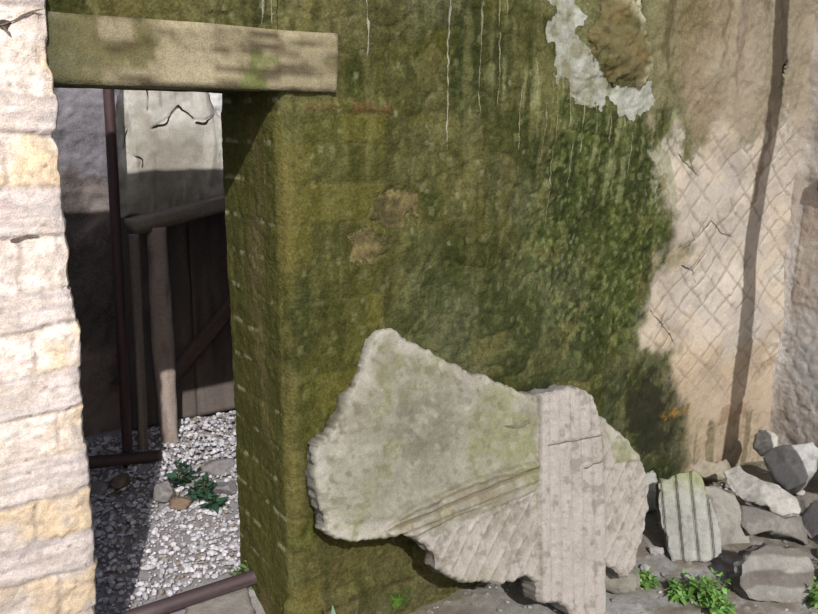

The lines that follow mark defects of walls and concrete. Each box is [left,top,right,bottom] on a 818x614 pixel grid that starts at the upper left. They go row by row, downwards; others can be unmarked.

crack [0,9,43,36]